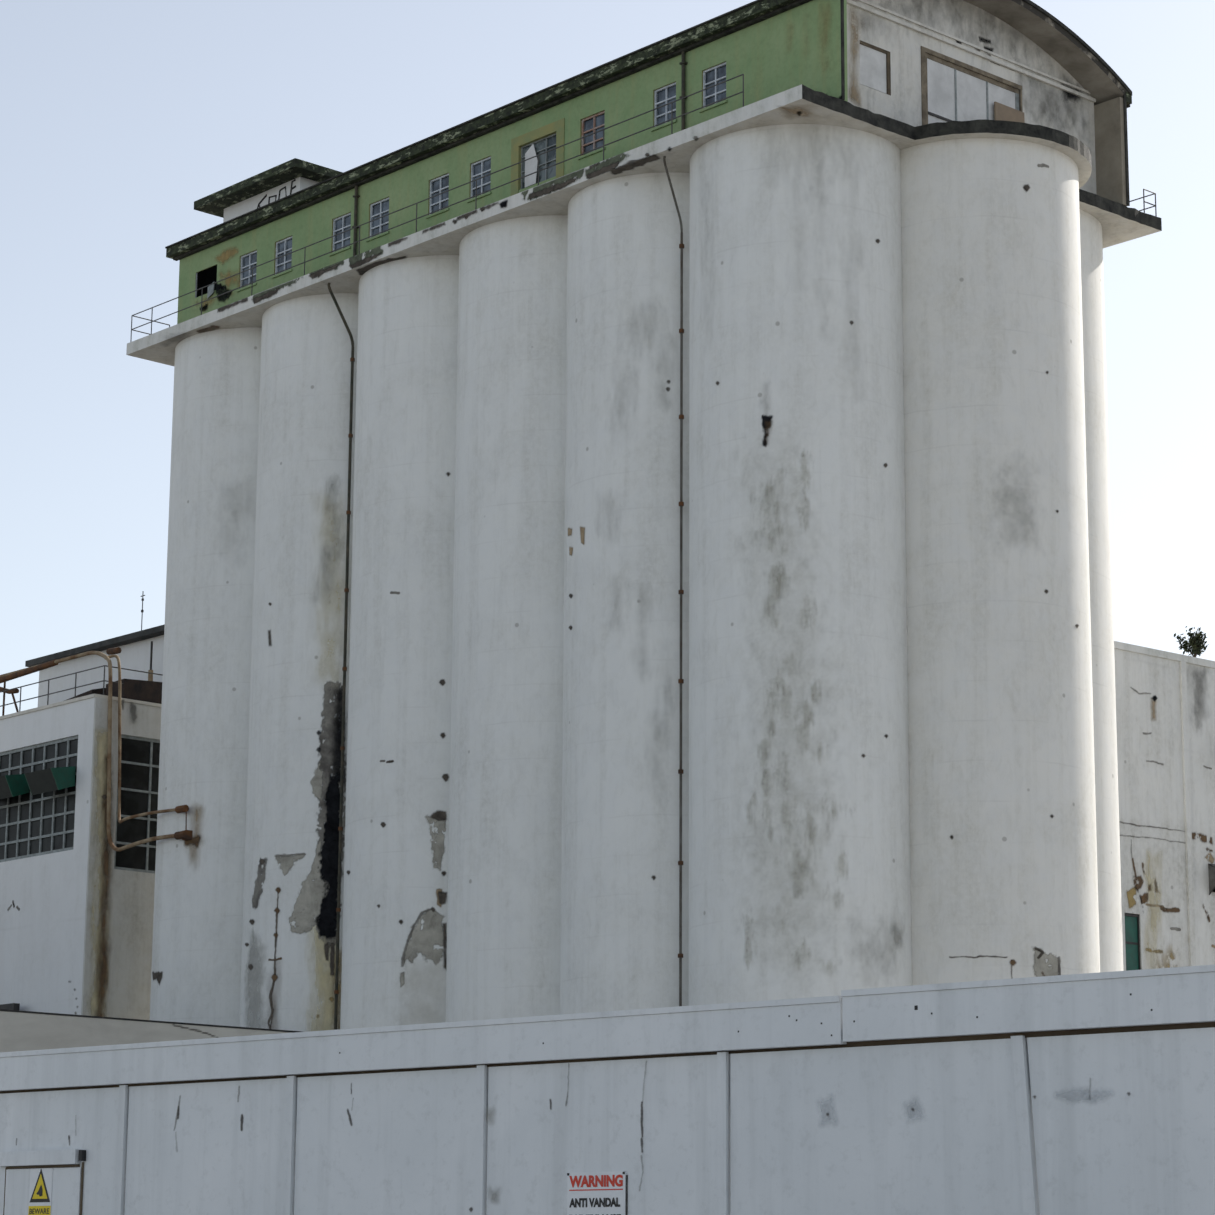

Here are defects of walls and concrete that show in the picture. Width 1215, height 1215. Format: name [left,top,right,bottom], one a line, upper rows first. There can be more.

spalling [762,415,772,446]
corrosion [91,733,112,1017]
spalling [249,681,350,975]
peeling [399,811,447,986]
peeling [1127,858,1158,908]
spalling [1192,833,1214,863]
leakage [312,928,341,1031]
spalling [1033,947,1061,977]